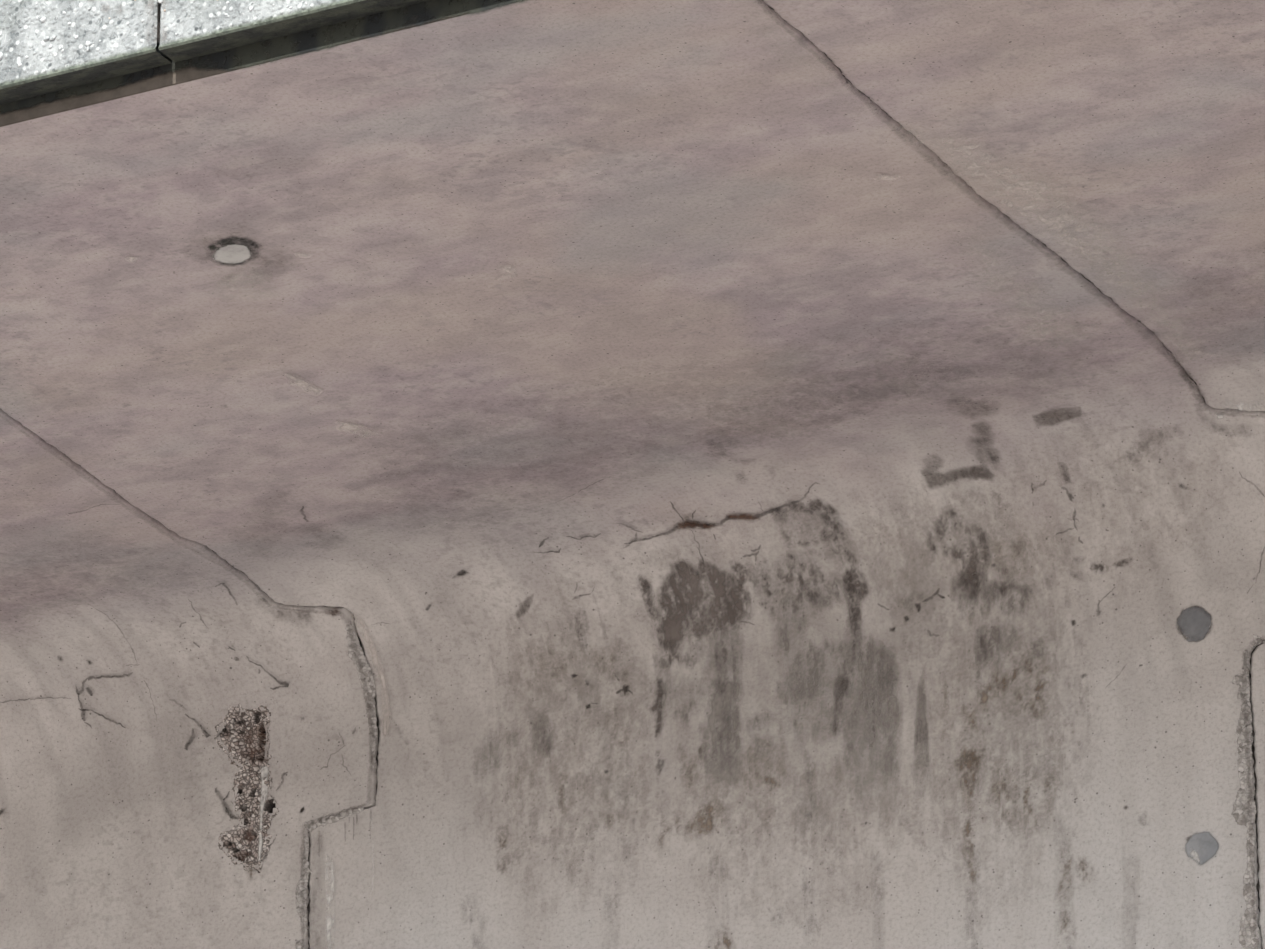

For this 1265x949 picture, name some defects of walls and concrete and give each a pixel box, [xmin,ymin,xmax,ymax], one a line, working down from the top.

crack [633,488,810,562]
damp [641,561,748,665]
damp [762,499,899,764]
damp [952,536,1027,614]
damp [651,682,663,733]
damp [699,647,740,767]
damp [916,686,927,750]
damp [981,644,1045,715]
spalling [214,703,287,876]